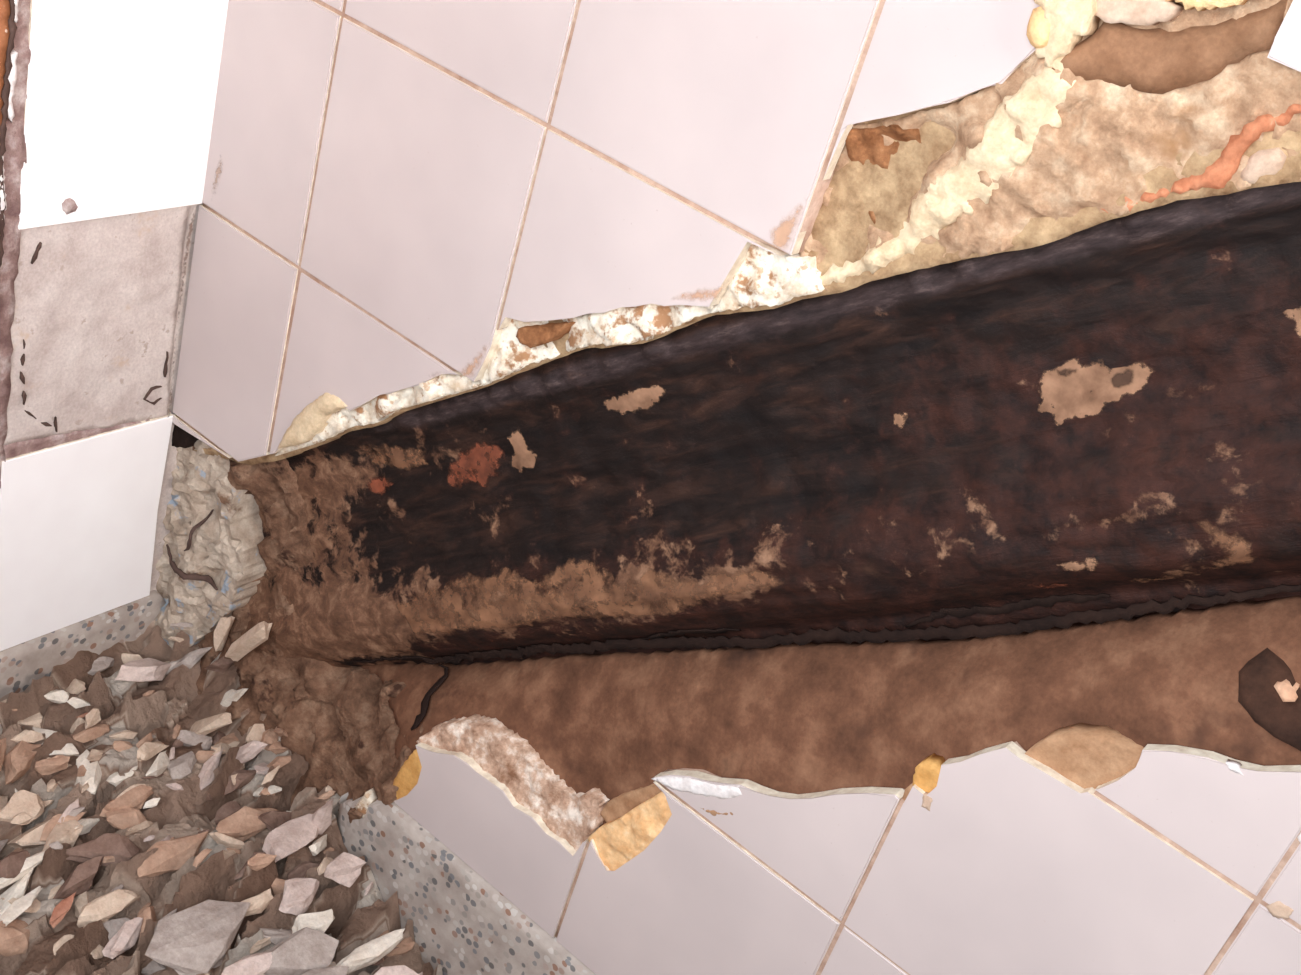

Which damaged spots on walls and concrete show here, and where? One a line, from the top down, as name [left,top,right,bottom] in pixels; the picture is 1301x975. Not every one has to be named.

peeling [7,50,18,123]
peeling [3,198,190,459]
rust [359,444,428,493]
rust [447,430,537,487]
spalling [155,0,1301,871]
crack [166,509,218,590]